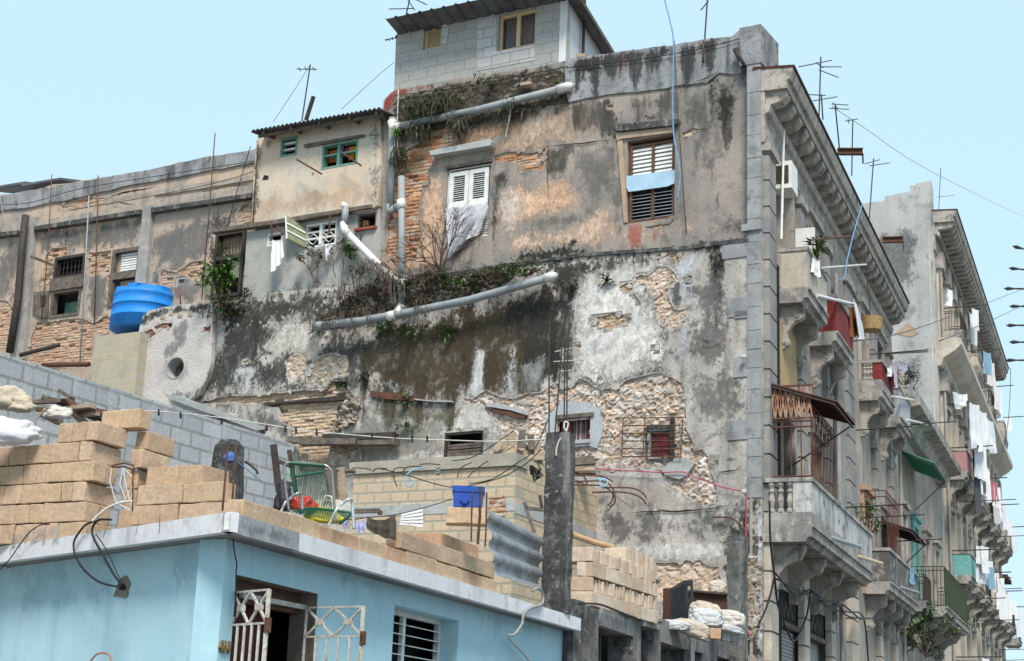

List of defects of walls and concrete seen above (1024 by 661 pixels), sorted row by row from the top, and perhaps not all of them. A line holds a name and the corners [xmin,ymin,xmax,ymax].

spalling [383,127,457,269]
spalling [491,145,549,175]
damp [456,47,671,203]
damp [680,38,747,150]
spalling [0,297,13,352]
spalling [38,245,70,291]
spalling [28,313,110,369]
spalling [87,251,111,288]
damp [142,279,364,437]
spalling [199,351,359,474]
damp [306,214,659,460]
spalling [462,251,718,506]